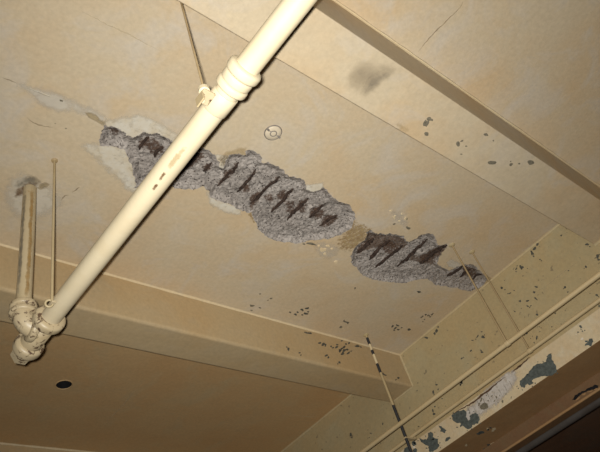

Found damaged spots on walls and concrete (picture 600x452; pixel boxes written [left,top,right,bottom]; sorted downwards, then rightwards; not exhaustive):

spalling [87,113,172,188]
damp [7,176,59,215]
spalling [170,147,356,245]
spalling [350,230,487,291]
peeling [516,354,559,390]
peeling [450,395,503,435]
peeling [404,426,450,452]